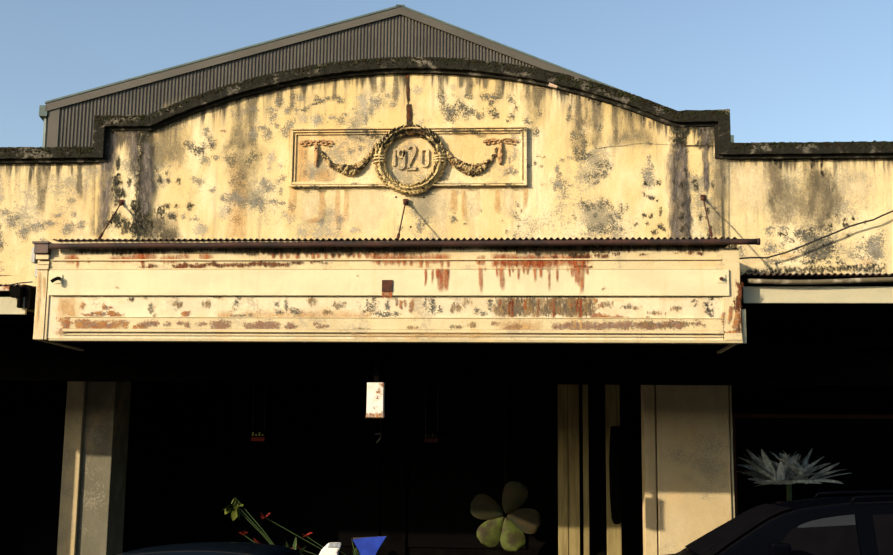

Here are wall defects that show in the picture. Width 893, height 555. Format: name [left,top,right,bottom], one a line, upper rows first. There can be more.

water stain [459,76,503,97]
water stain [70,165,83,197]
water stain [92,121,194,240]
water stain [634,126,725,239]
water stain [769,159,866,237]
rust [54,302,231,335]
rust [243,319,298,334]
peeling [363,296,401,317]
peeling [423,296,694,329]
rust [477,252,706,330]
rust [720,282,744,333]